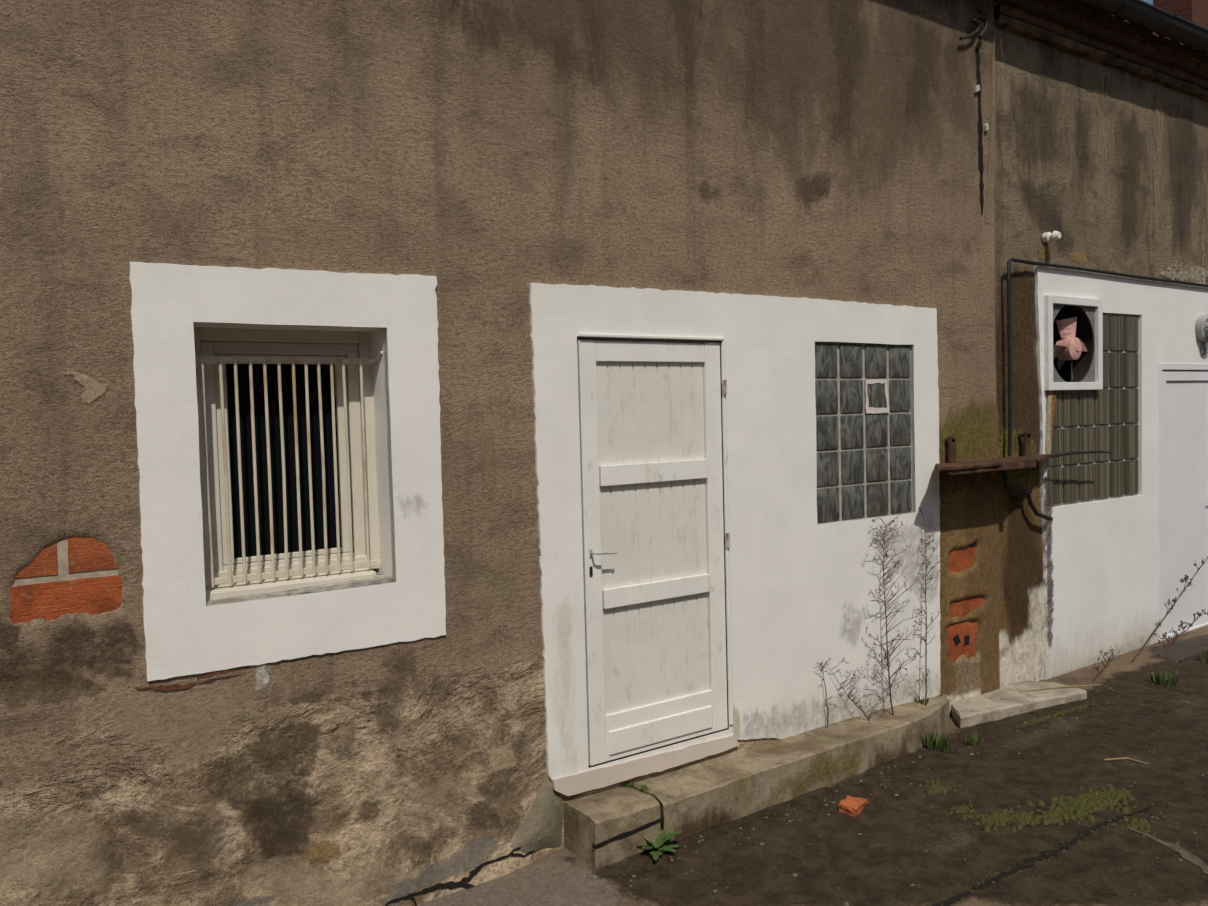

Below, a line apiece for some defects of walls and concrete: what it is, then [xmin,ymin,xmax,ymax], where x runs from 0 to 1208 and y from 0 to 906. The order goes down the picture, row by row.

water stain [1076,95,1208,269]
flaking render [63,371,108,403]
flaking render [948,542,977,572]
flaking render [0,537,138,707]
flaking render [946,597,985,662]
water stain [357,801,380,822]
water stain [467,740,523,829]
crack [385,847,542,906]